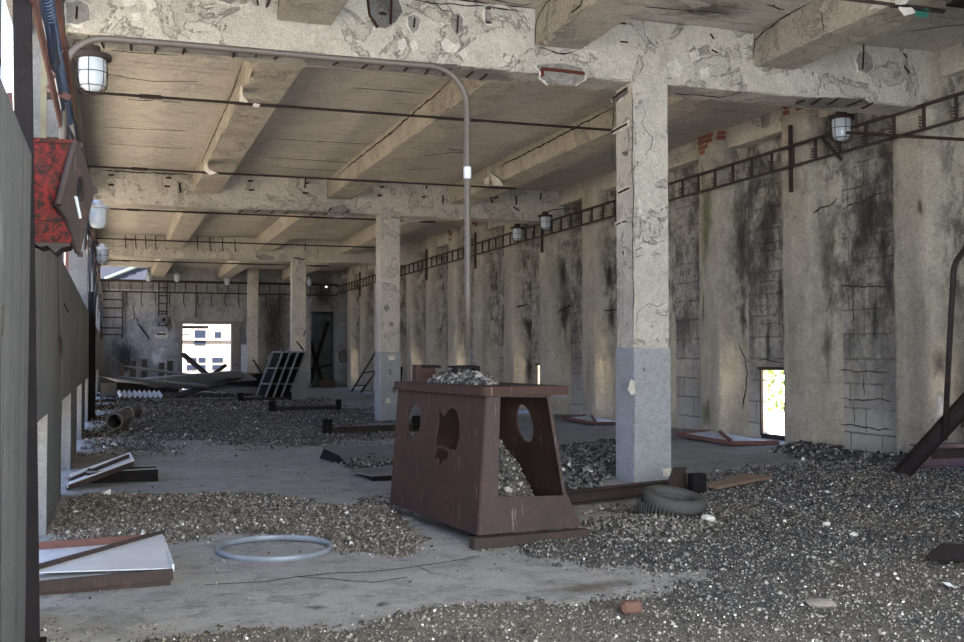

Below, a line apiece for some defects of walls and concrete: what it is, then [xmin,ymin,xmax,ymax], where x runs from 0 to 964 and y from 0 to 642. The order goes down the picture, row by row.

spalling [63,0,92,37]
flaking render [122,0,157,22]
spalling [365,0,422,52]
spalling [482,4,493,26]
spalling [100,42,283,60]
spalling [304,11,513,81]
spalling [534,62,587,86]
flaking render [697,131,727,155]